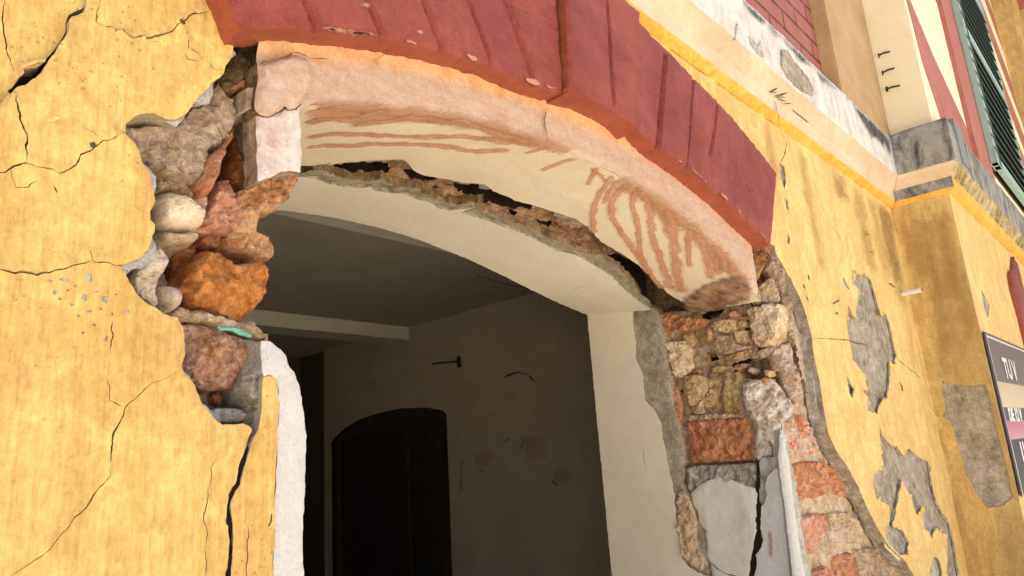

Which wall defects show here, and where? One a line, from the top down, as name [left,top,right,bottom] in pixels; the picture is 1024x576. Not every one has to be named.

crack [126,13,201,39]
crack [1,3,124,191]
crack [3,261,121,276]
spalling [125,46,298,426]
crack [110,380,162,459]
crack [225,447,248,576]
spalling [659,233,848,570]
peeling [832,271,903,413]
peeling [801,436,957,576]
peeling [942,381,1013,508]